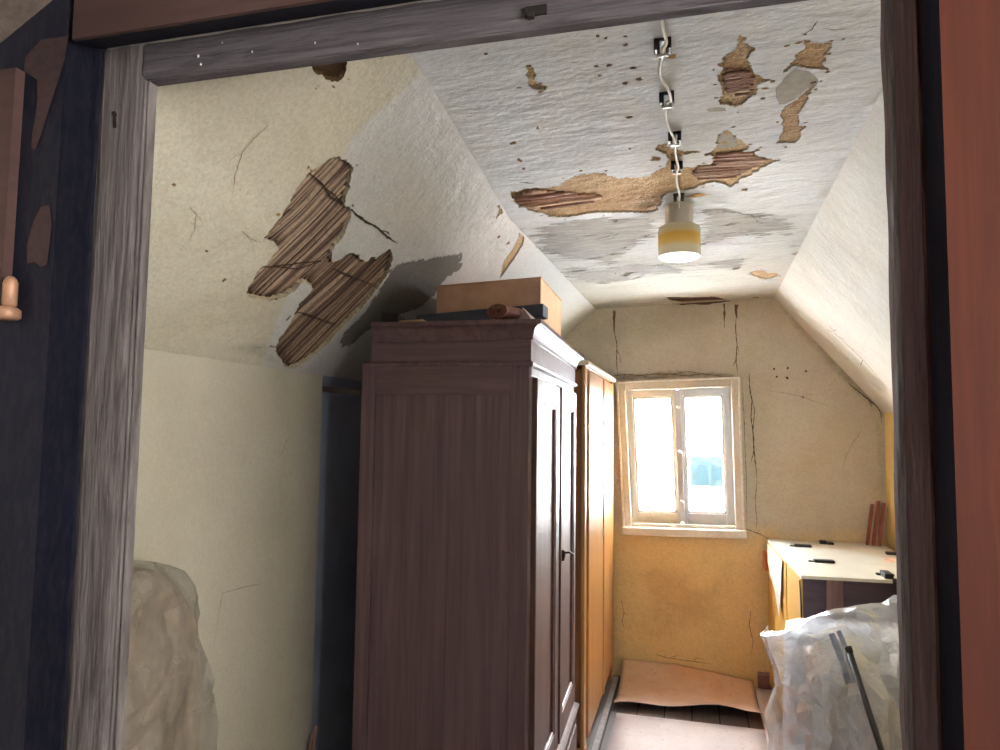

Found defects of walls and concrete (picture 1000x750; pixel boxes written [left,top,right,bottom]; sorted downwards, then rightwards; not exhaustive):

flaking render [311,62,349,90]
flaking render [517,65,547,93]
flaking render [713,33,845,148]
crack [231,125,268,191]
flaking render [246,156,393,369]
crack [351,209,397,243]
flaking render [498,126,781,284]
crack [614,321,835,539]